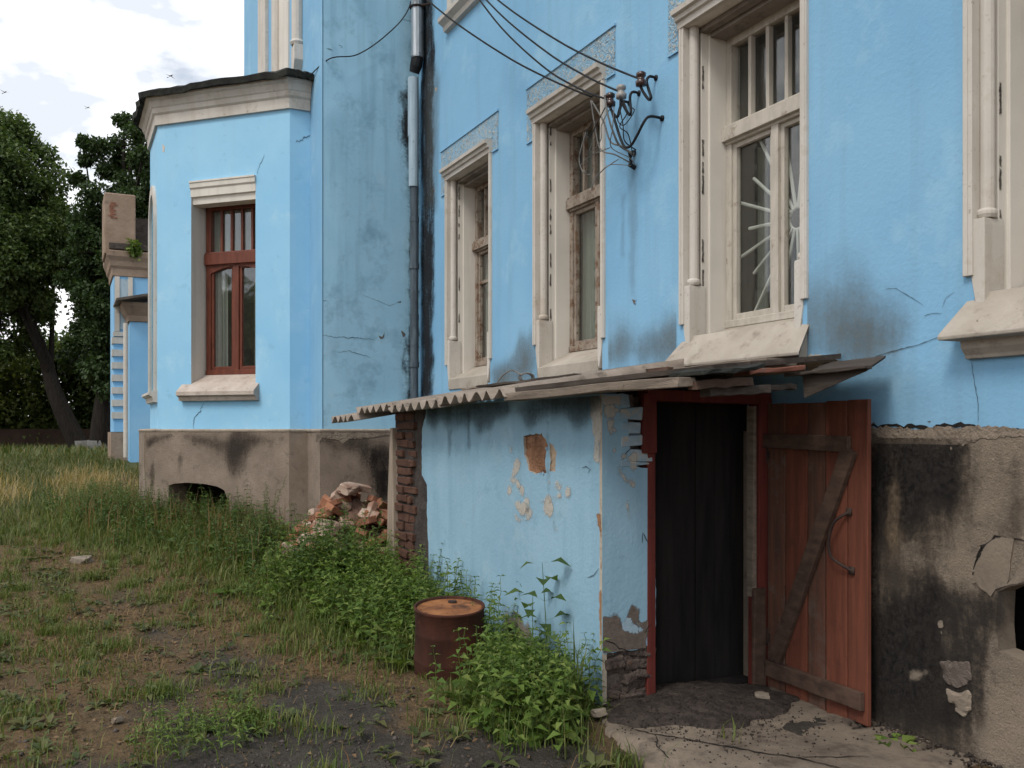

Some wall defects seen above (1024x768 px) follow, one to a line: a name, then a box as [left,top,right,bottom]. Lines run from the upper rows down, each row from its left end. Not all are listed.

crack [875,288,954,357]
crack [871,363,985,429]
leakage [199,432,257,471]
flaking render [507,434,570,521]
flaking render [603,605,657,702]
flaking render [946,688,972,717]